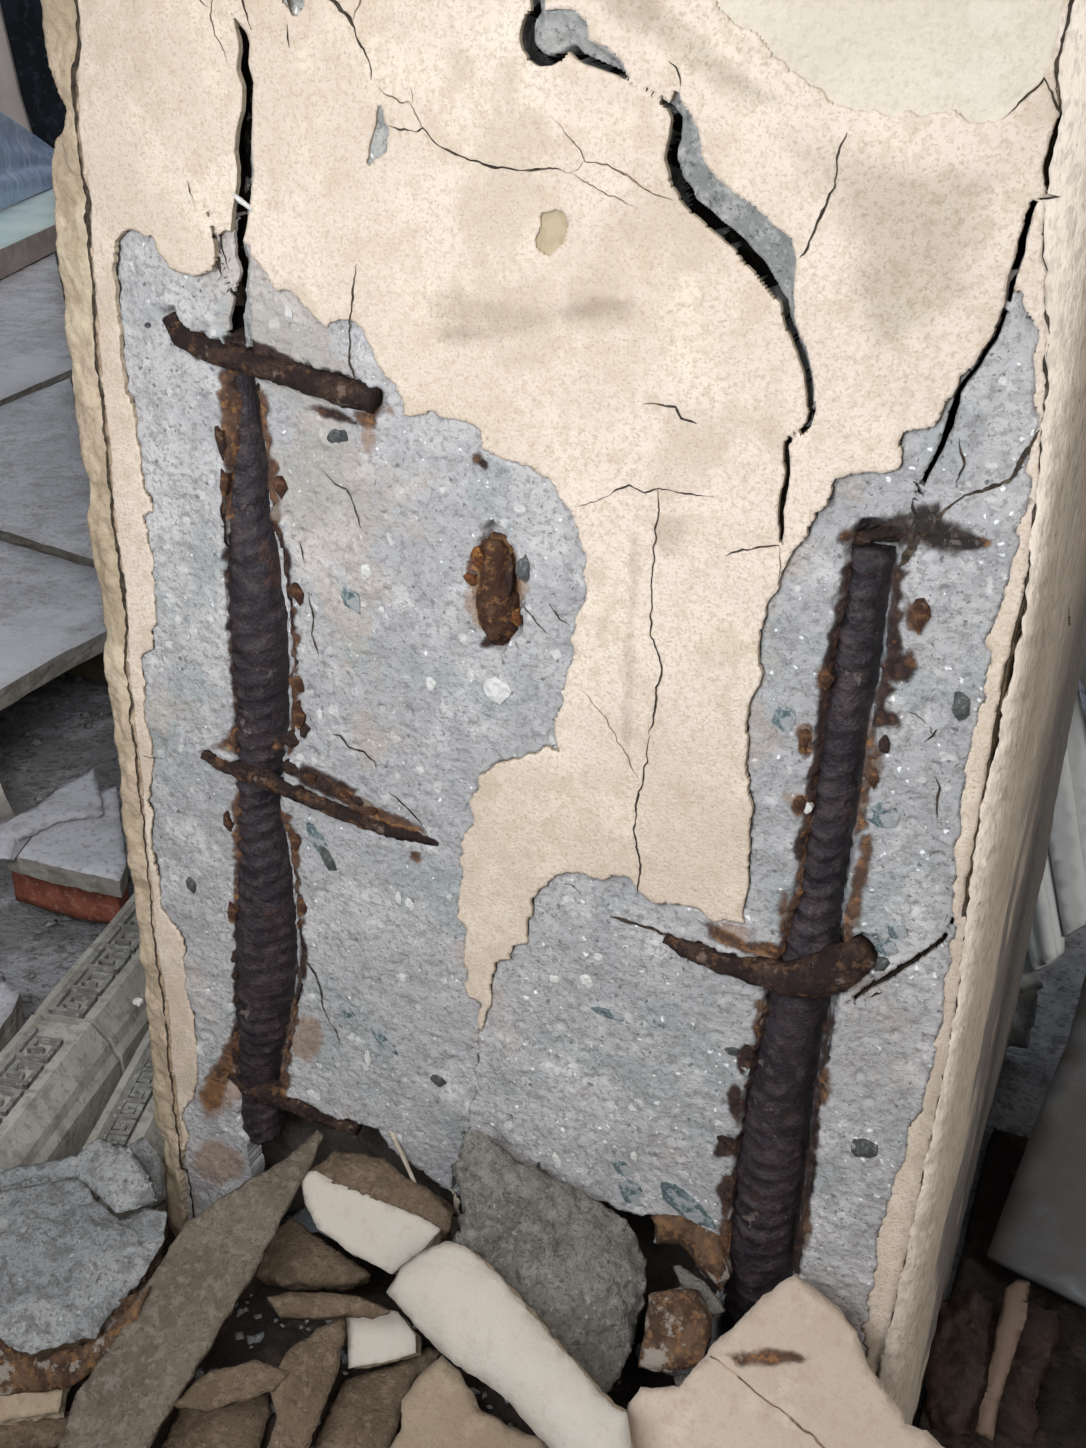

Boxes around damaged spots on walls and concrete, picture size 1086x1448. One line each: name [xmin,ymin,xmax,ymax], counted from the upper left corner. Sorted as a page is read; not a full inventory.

crack [70,0,195,1218]
crack [220,496,231,547]
crack [199,0,262,431]
corrosion [214,369,425,834]
corrosion [463,531,523,648]
spalling [116,210,1040,1356]
crack [330,0,847,581]
corrosion [705,562,853,959]
corrosion [838,503,990,942]
crack [854,0,1075,1000]
corrosion [713,1000,770,1256]
corrosion [792,1005,835,1275]